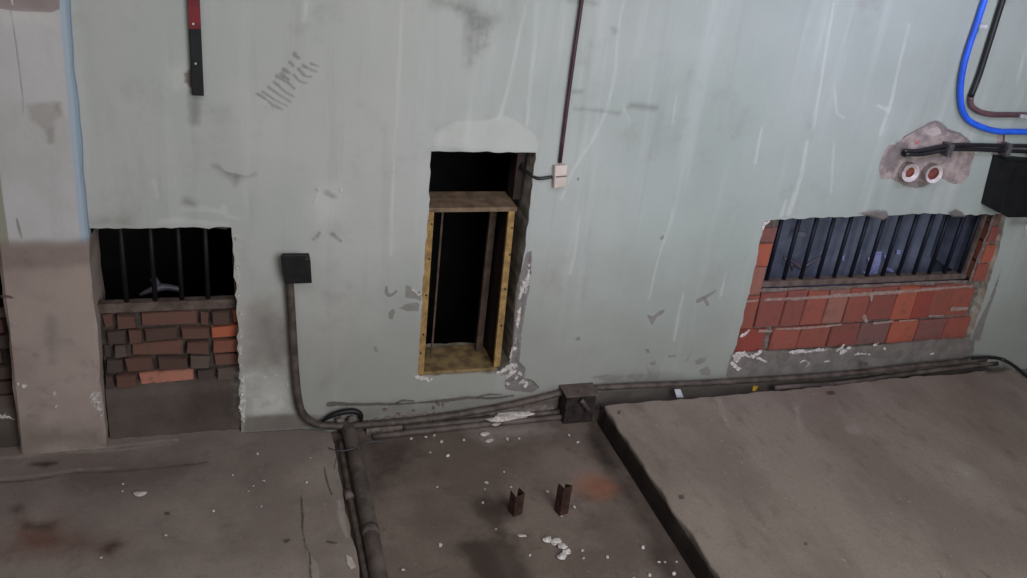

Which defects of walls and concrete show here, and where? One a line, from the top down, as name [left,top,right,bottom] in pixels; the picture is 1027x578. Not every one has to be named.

flaking render [879,120,977,188]
flaking render [496,251,539,393]